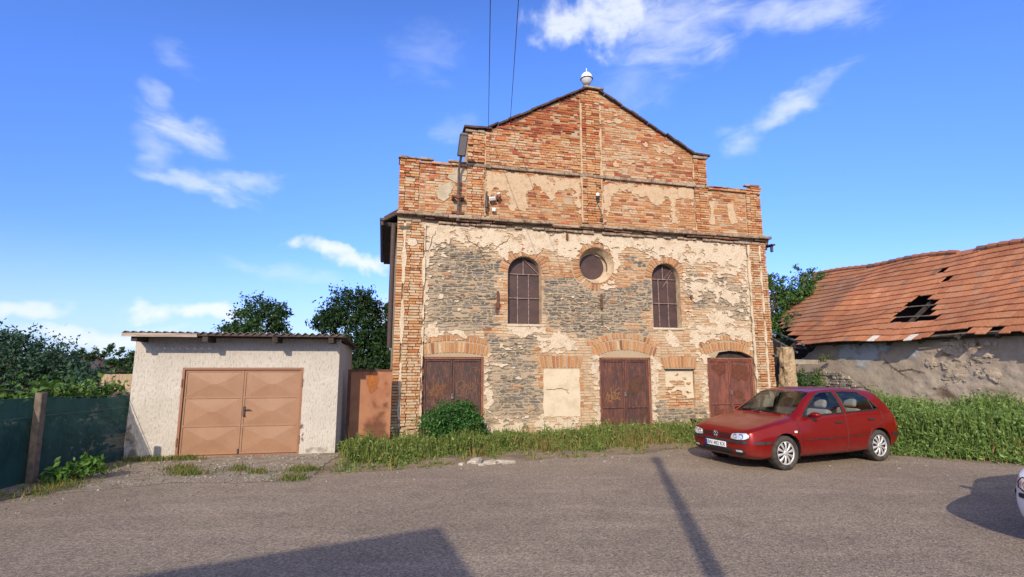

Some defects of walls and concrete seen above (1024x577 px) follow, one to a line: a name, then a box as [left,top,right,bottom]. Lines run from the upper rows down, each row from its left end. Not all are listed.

peeling [642,132,681,167]
peeling [486,171,582,214]
peeling [602,142,694,224]
spalling [424,238,544,432]
spalling [542,277,652,340]
spalling [681,265,750,322]
peeling [800,343,889,389]
spalling [654,401,709,425]